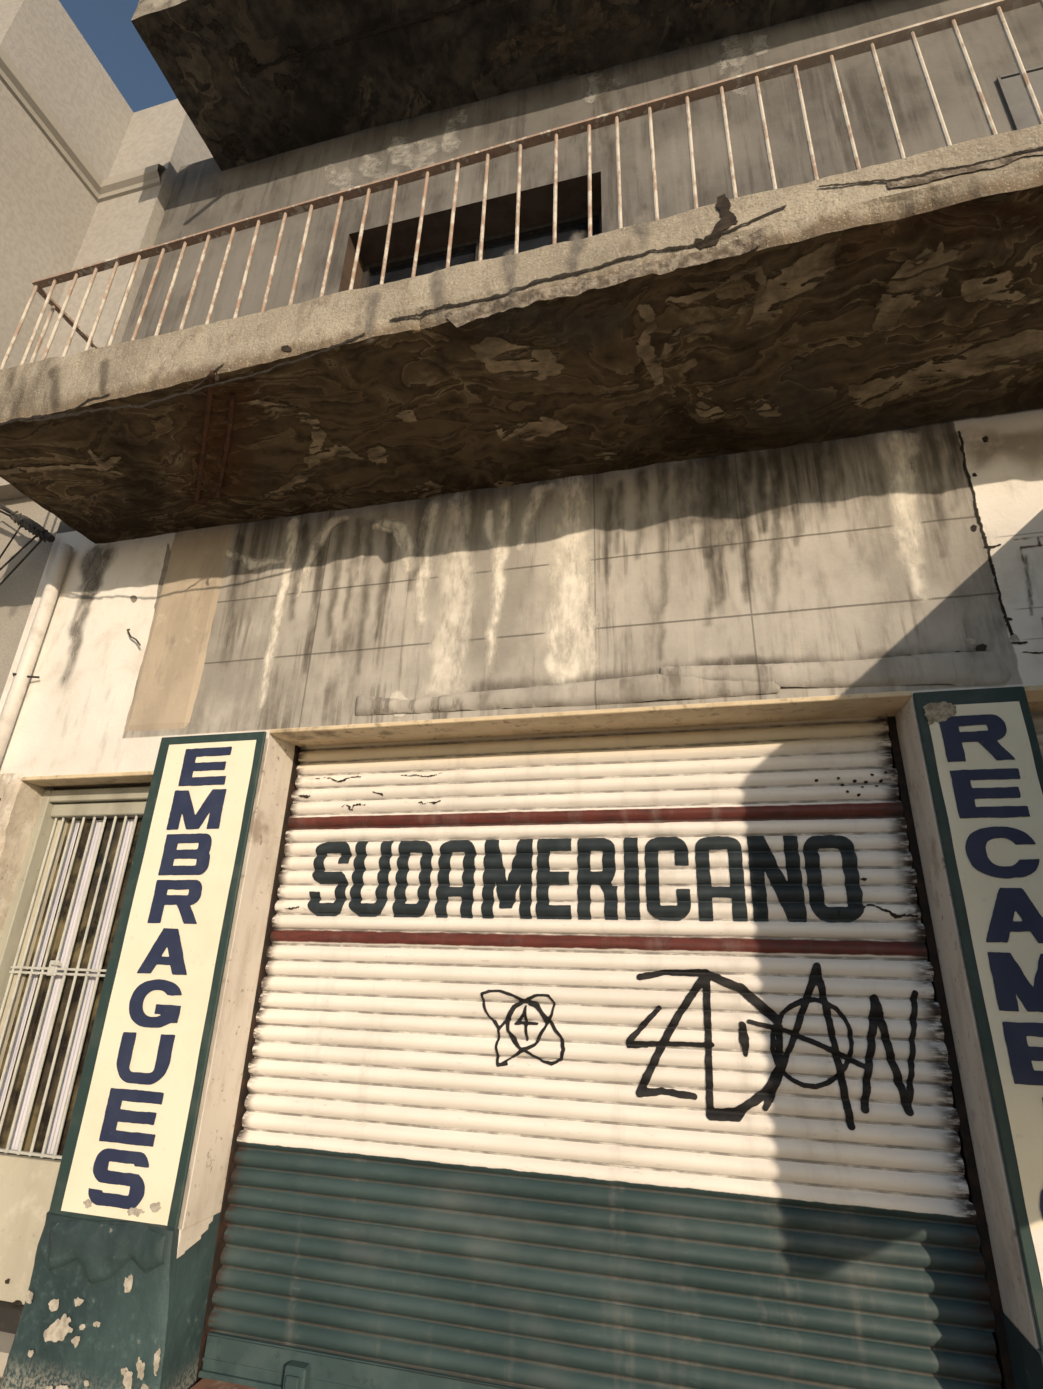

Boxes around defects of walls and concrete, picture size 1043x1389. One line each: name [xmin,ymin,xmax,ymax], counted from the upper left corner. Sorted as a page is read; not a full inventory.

crack [818,146,1043,187]
crack [0,205,786,425]
leakage [63,547,113,681]
leakage [226,516,350,708]
leakage [374,475,597,696]
leakage [877,431,926,600]
crack [958,431,1043,654]
peeling [12,1290,100,1358]
peeling [123,1274,133,1293]
peeling [121,1348,161,1389]